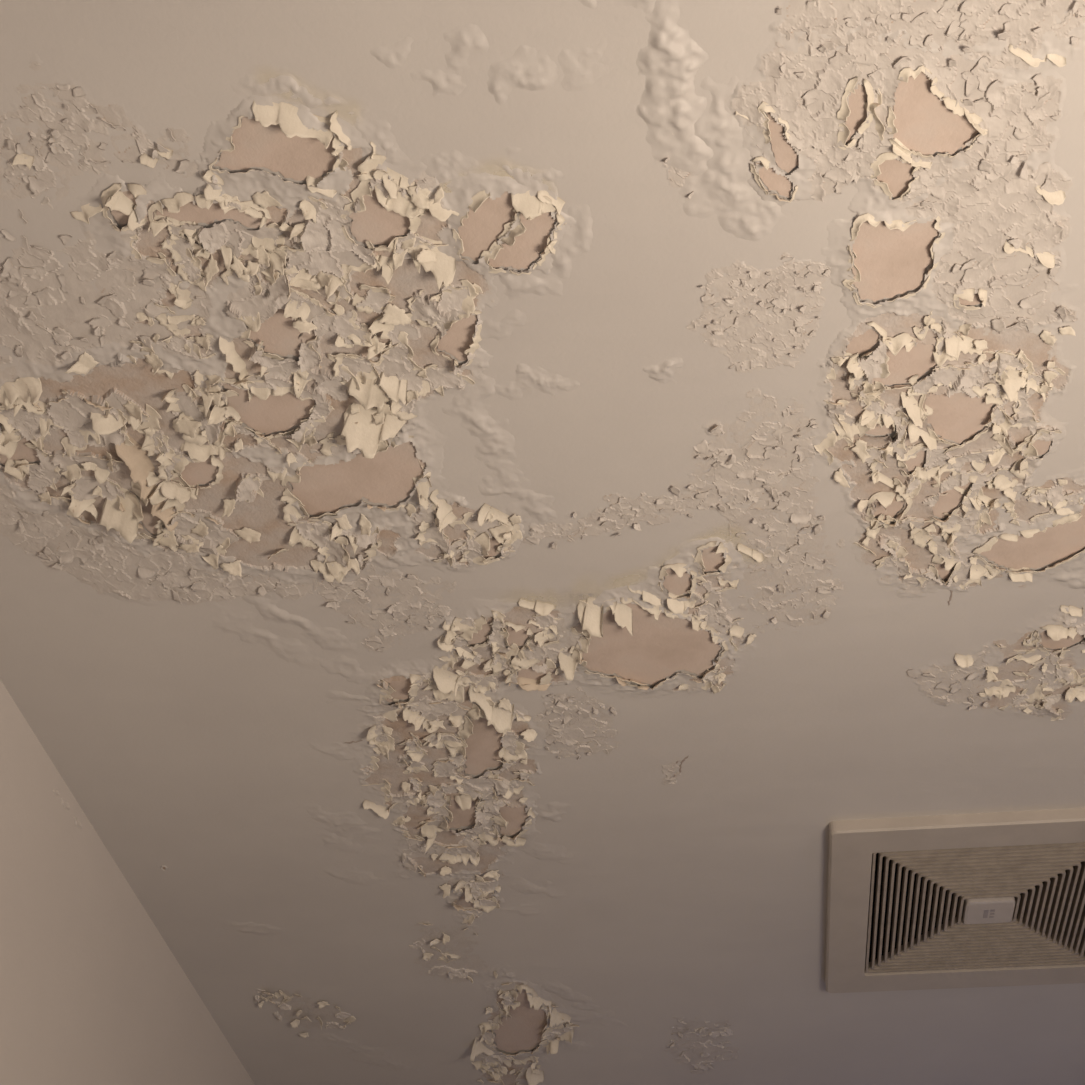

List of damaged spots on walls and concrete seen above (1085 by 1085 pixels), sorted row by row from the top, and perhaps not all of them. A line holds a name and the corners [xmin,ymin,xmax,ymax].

peeling [0,75,697,1085]
peeling [555,0,1085,701]
peeling [901,602,1085,721]